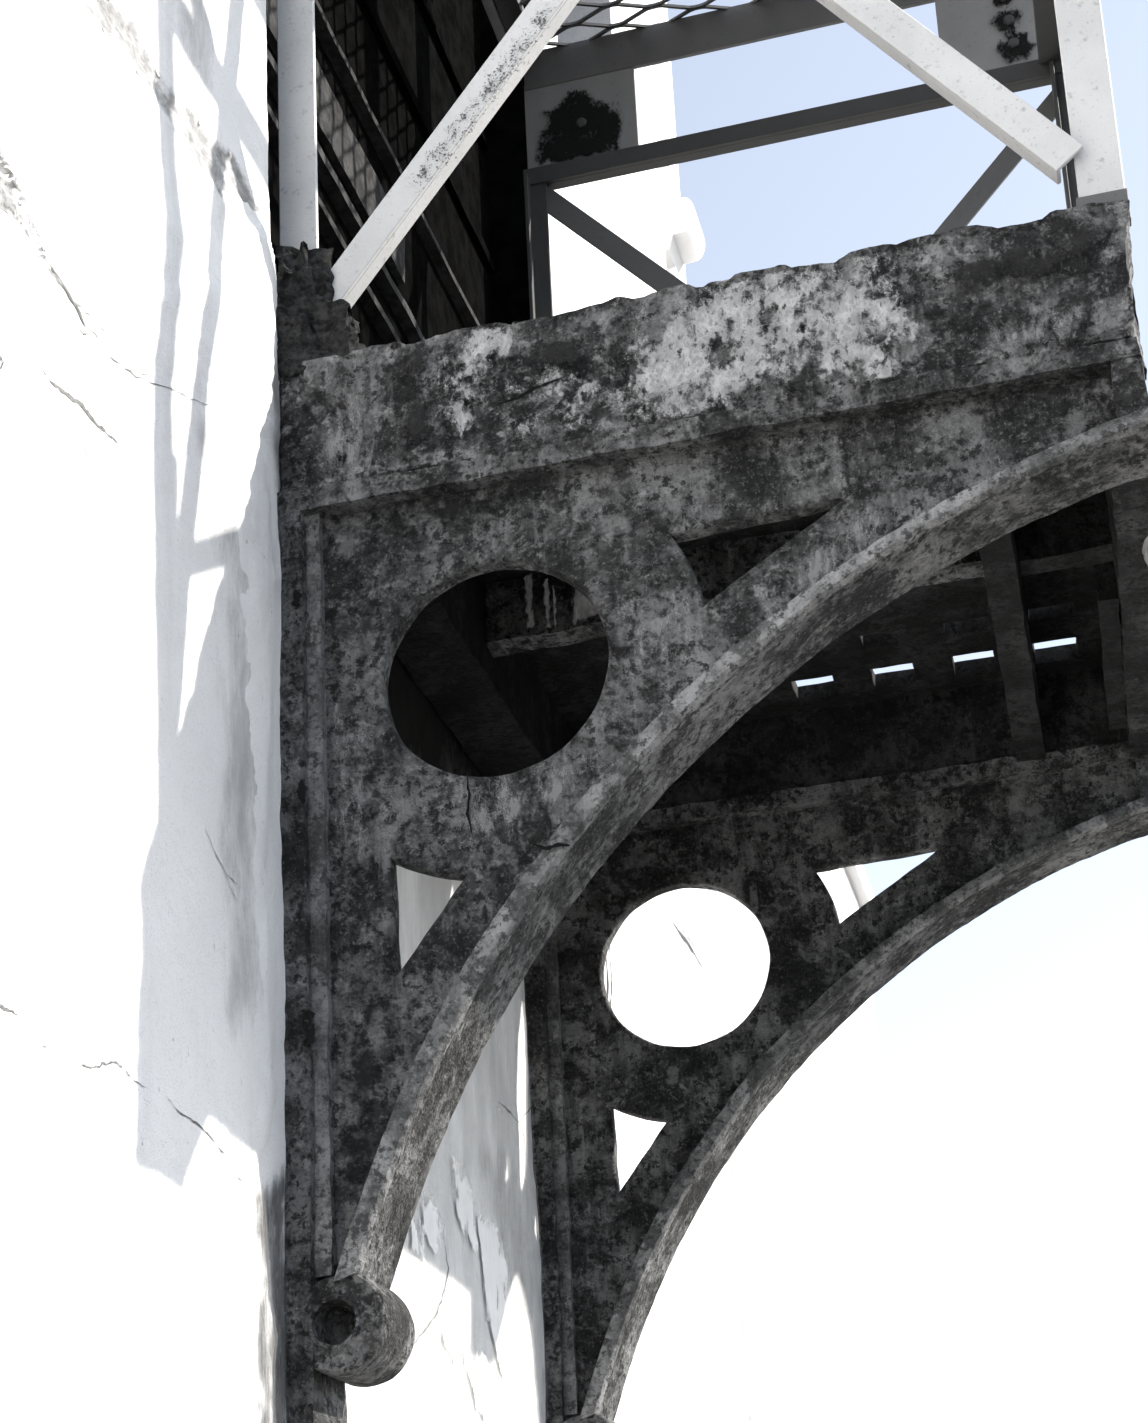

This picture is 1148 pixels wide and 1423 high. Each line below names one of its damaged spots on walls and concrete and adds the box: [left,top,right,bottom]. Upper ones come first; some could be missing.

corrosion [991,0,1037,63]
corrosion [535,90,622,165]
crack [43,371,118,471]
crack [0,1004,253,1193]
corrosion [257,1170,289,1423]
flaking render [411,1158,509,1421]